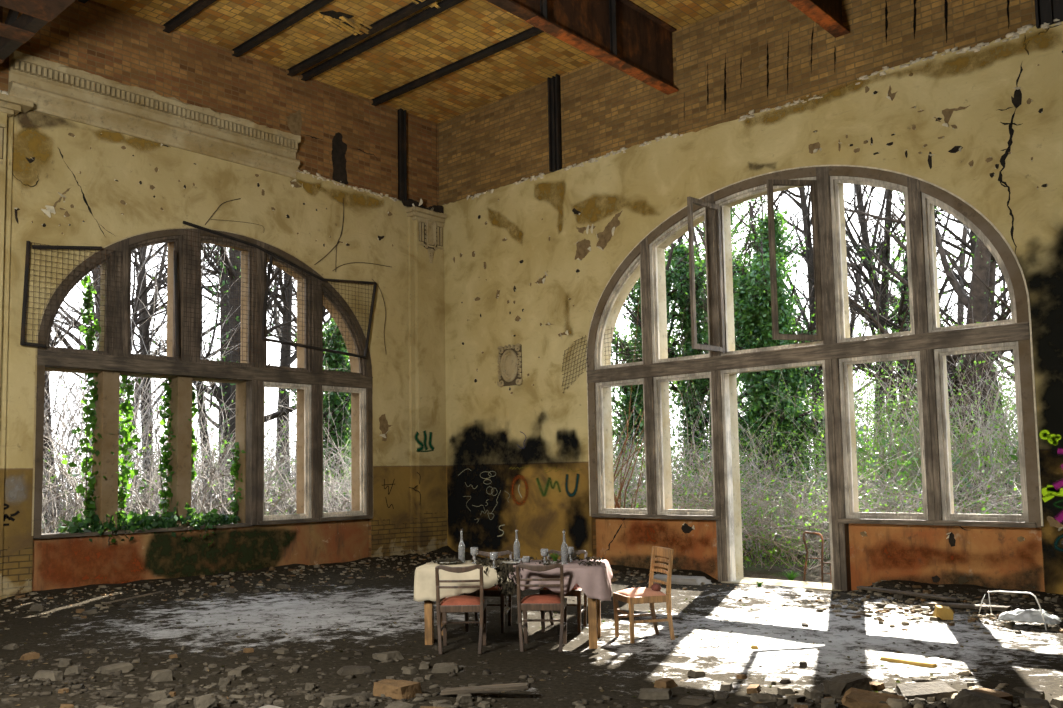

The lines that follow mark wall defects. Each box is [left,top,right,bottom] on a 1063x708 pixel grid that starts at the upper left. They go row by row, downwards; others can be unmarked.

flaking render [808,130,822,154]
flaking render [838,133,895,155]
flaking render [905,105,970,169]
crack [998,25,1059,252]
flaking render [572,208,622,273]